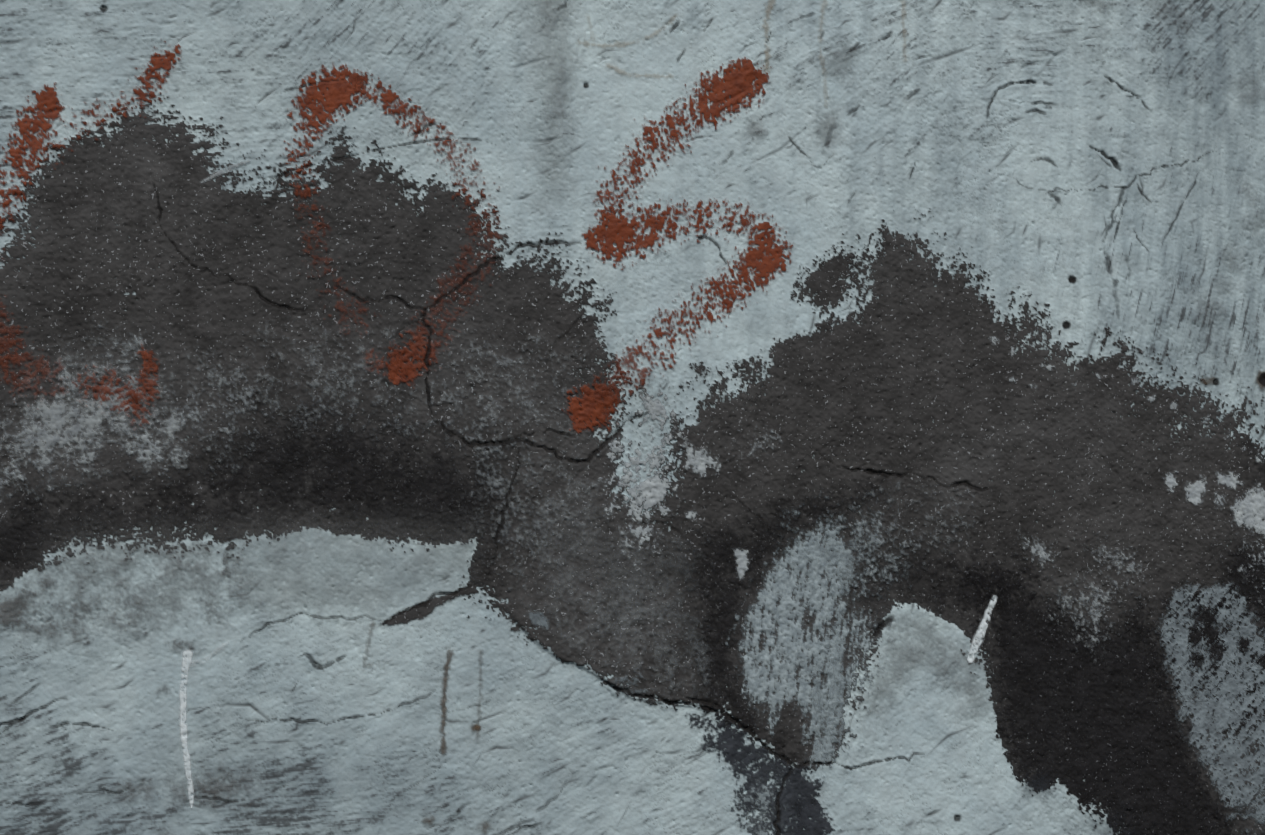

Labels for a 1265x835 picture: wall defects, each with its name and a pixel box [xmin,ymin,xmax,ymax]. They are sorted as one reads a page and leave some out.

crack [698,236,726,263]
crack [335,240,641,548]
crack [846,468,988,491]
crack [388,587,468,621]
crack [608,683,917,835]